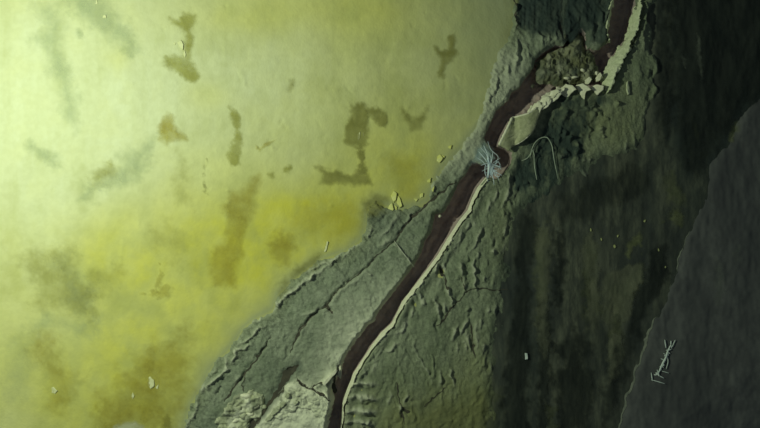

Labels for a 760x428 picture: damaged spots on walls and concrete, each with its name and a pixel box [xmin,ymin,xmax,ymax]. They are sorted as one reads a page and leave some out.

damp [167,58,198,81]
damp [176,16,193,52]
damp [436,36,456,75]
spalling [498,0,643,151]
damp [323,104,387,184]
crack [249,0,636,428]
spalling [340,177,489,428]
crack [224,338,271,402]
spalling [215,381,332,428]
flaking render [322,364,342,386]